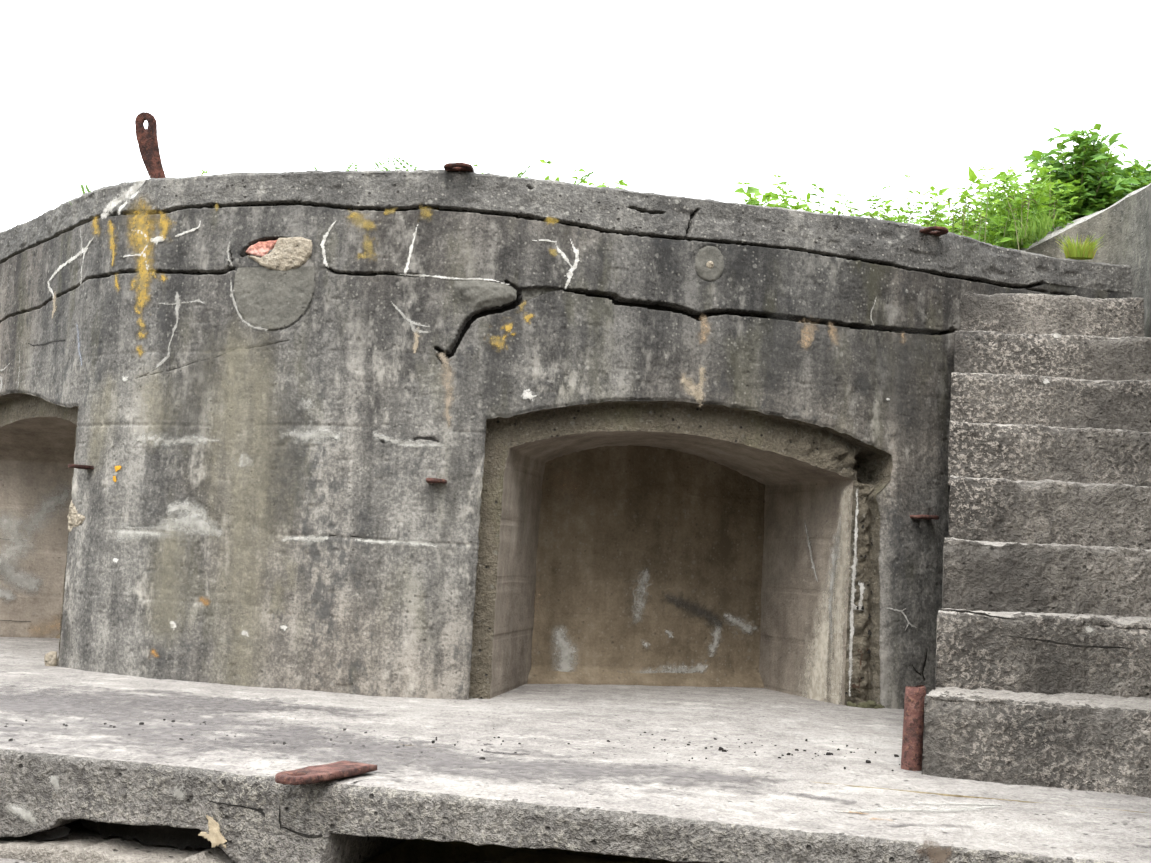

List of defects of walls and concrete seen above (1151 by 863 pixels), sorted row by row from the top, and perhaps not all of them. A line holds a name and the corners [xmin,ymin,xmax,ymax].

efflorescence [47,227,93,319]
efflorescence [123,222,201,270]
leakage [226,242,267,331]
spalling [246,237,312,271]
leakage [320,221,336,267]
crack [98,203,1060,295]
efflorescence [155,291,205,369]
crack [439,298,519,362]
crack [575,293,945,335]
crack [0,819,222,850]
crack [208,800,323,838]